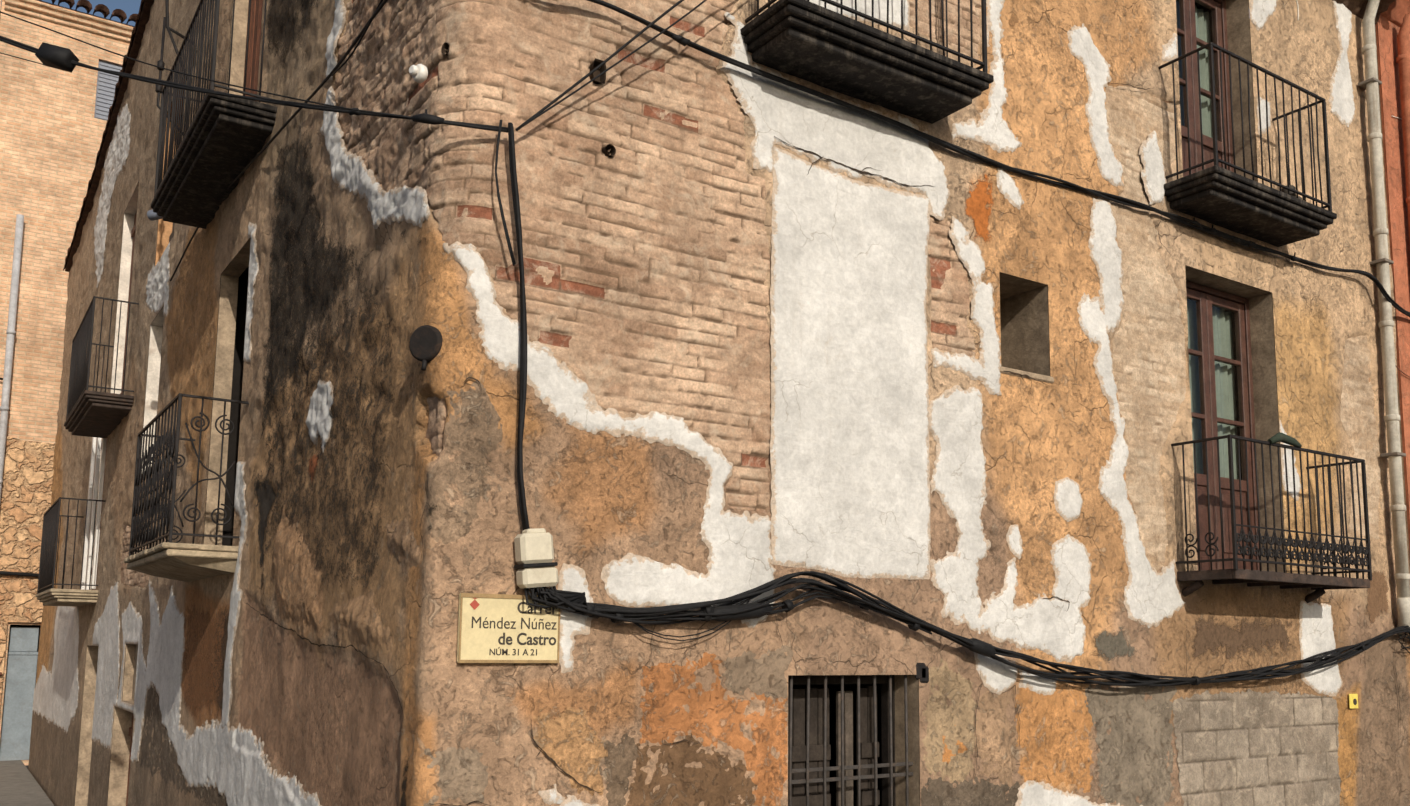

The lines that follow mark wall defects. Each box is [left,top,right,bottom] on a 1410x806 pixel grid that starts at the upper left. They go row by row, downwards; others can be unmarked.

damp [266,0,319,68]
spalling [908,0,981,59]
damp [252,132,398,594]
spalling [334,0,771,516]
spalling [928,215,976,357]
flaking render [425,381,503,545]
crack [246,603,404,716]
flaking render [533,652,787,806]